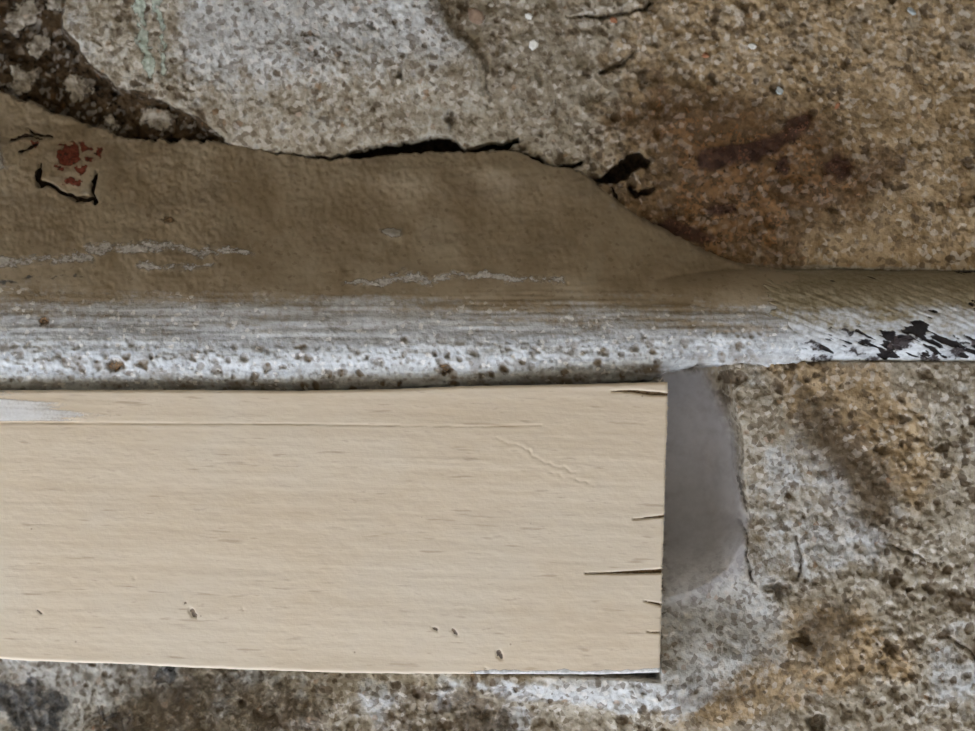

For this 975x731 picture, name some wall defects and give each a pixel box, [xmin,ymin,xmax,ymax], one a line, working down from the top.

spalling [0,0,225,143]
crack [322,139,656,200]
corrosion [612,82,888,268]
peeling [805,340,833,362]
peeling [841,328,975,361]